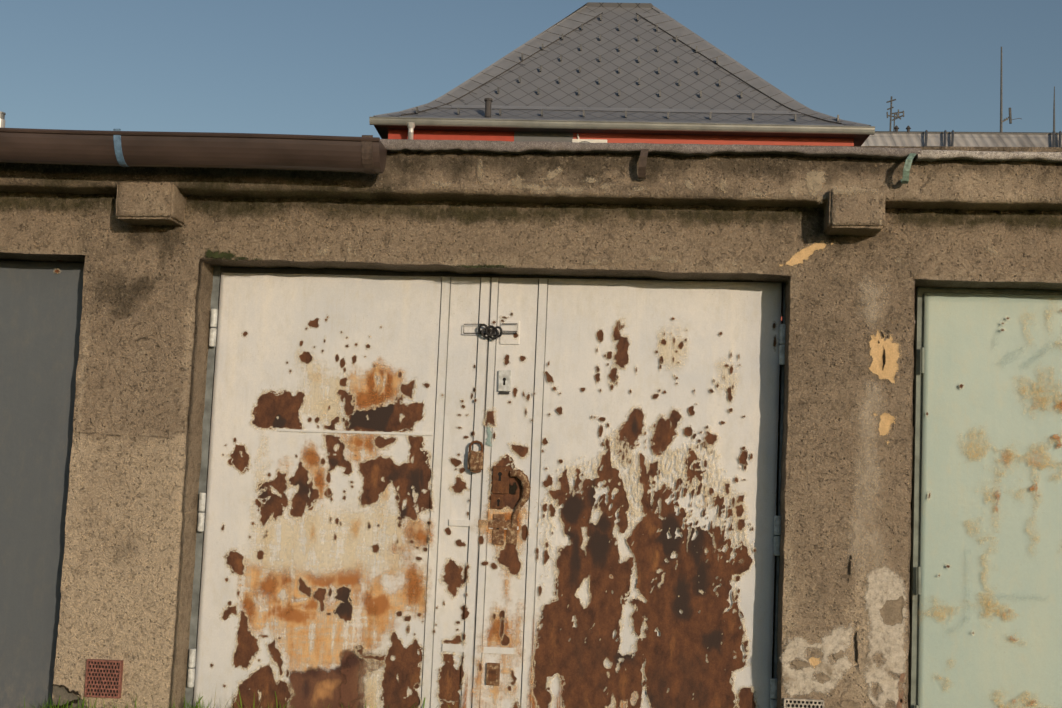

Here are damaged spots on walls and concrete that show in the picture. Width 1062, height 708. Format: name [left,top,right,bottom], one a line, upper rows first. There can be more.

peeling [779,239,833,267]
peeling [868,330,901,383]
peeling [873,413,895,447]
rust [222,316,756,708]
spalling [781,625,853,708]
spalling [839,566,907,708]